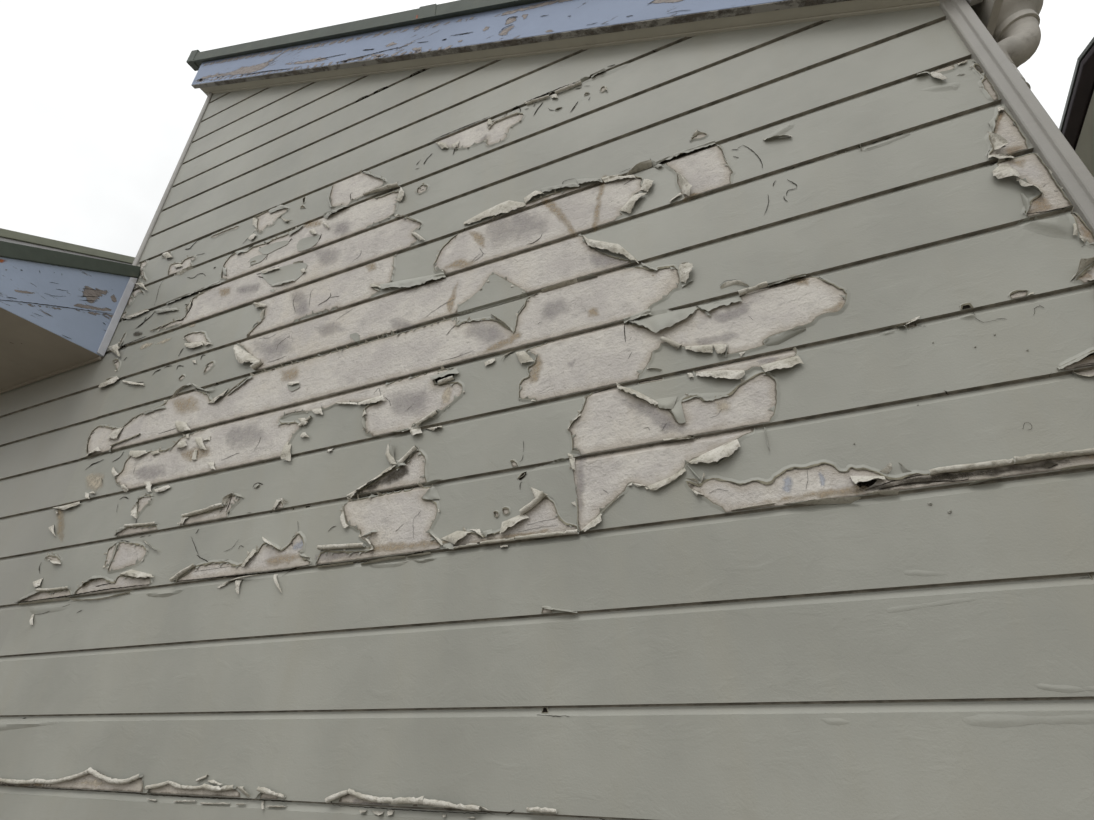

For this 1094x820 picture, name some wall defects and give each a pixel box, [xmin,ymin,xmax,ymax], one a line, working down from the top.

peeling [194,17,474,82]
peeling [483,0,572,35]
peeling [416,63,630,169]
peeling [763,123,795,141]
peeling [917,59,1094,291]
peeling [4,129,1094,625]
peeling [0,767,292,810]
peeling [325,788,492,819]